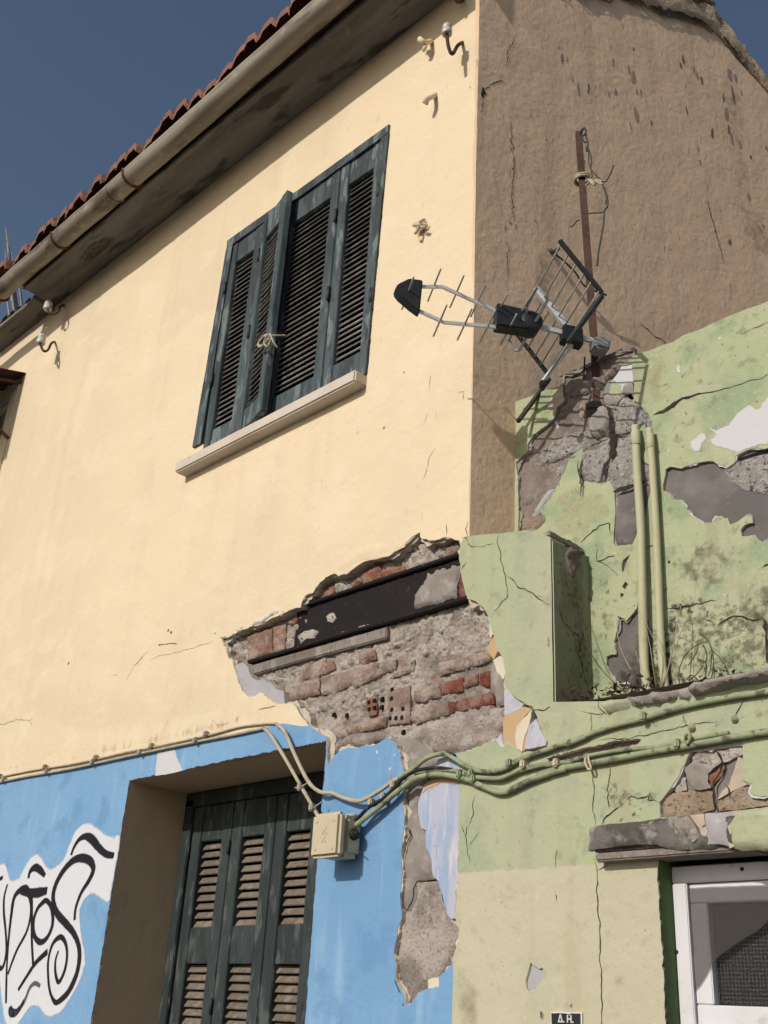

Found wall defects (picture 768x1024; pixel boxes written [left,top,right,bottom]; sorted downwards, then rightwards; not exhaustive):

crack [481,38,515,112]
peeling [723,68,752,159]
flaking render [517,346,657,546]
crack [552,374,768,496]
spalling [663,398,768,542]
crack [446,521,712,740]
spalling [607,604,653,689]
crack [668,600,768,663]
spalling [214,533,548,1006]
crack [592,775,657,824]
spalling [660,744,768,818]
crack [593,858,608,1024]